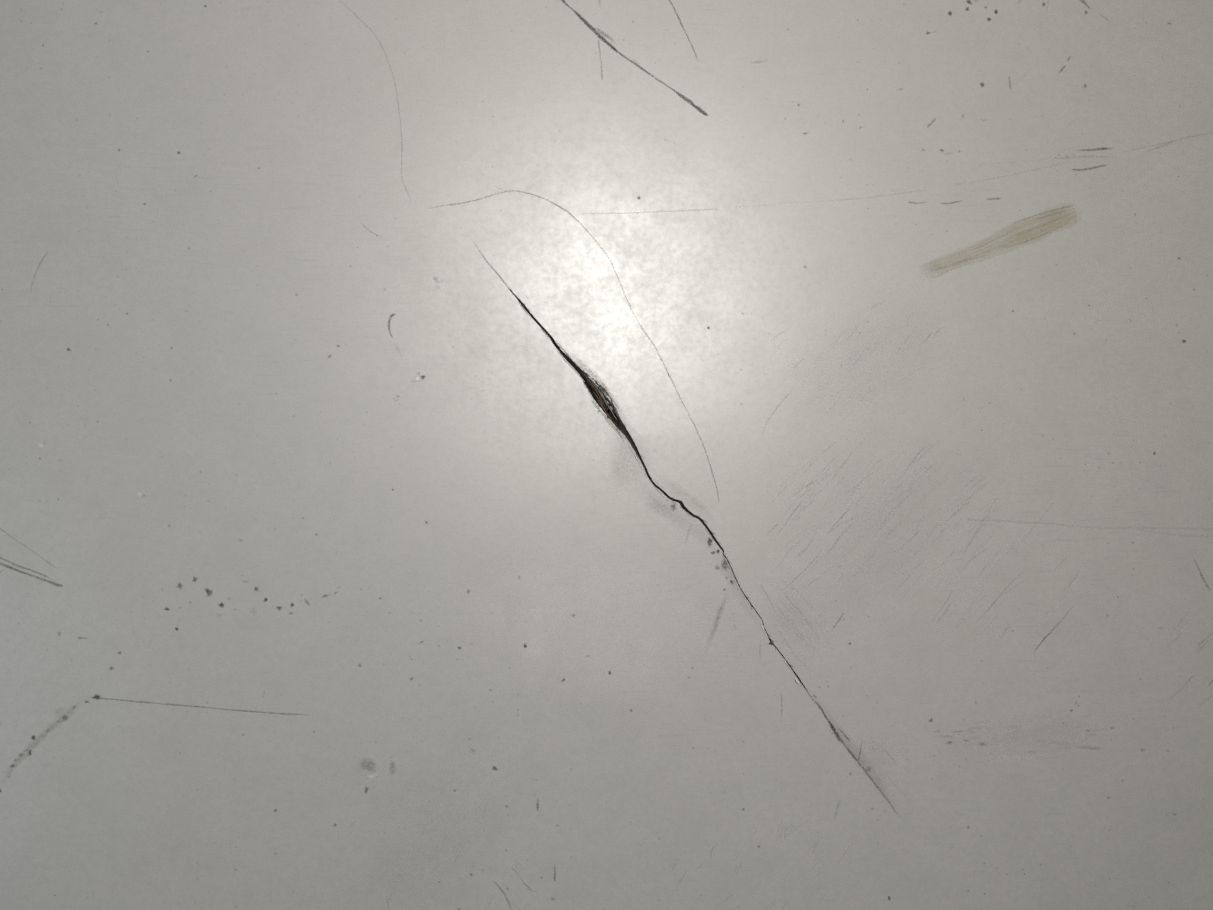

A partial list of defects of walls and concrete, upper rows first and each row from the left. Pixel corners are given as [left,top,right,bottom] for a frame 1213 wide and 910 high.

crack [510,289,855,758]